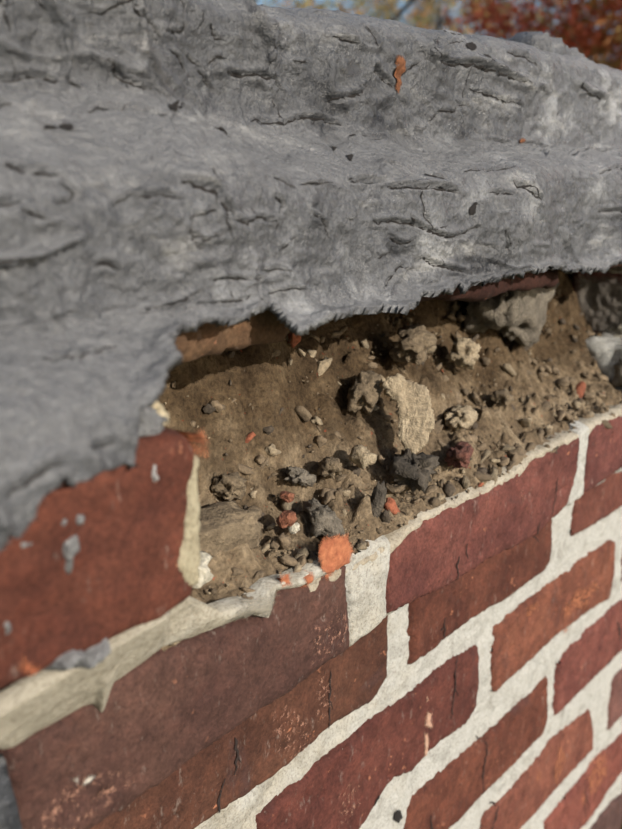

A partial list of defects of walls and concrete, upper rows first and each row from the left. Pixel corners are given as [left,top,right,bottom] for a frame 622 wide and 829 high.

crack [90,0,307,87]
crack [335,26,379,46]
crack [252,30,537,140]
corrosion [394,56,406,93]
crack [0,163,74,219]
crack [465,166,543,200]
crack [114,168,358,311]
crack [373,173,479,287]
peeling [379,373,435,455]
peeling [61,514,85,526]
spalling [318,535,353,578]
peeling [24,638,111,675]